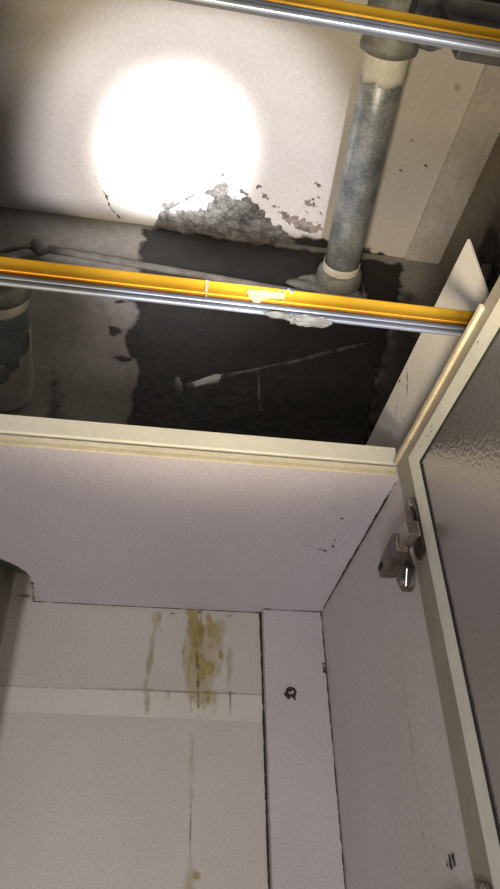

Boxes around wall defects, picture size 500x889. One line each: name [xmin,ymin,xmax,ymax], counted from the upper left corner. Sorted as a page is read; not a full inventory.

spalling [155,173,323,245]
leakage [183,609,223,708]